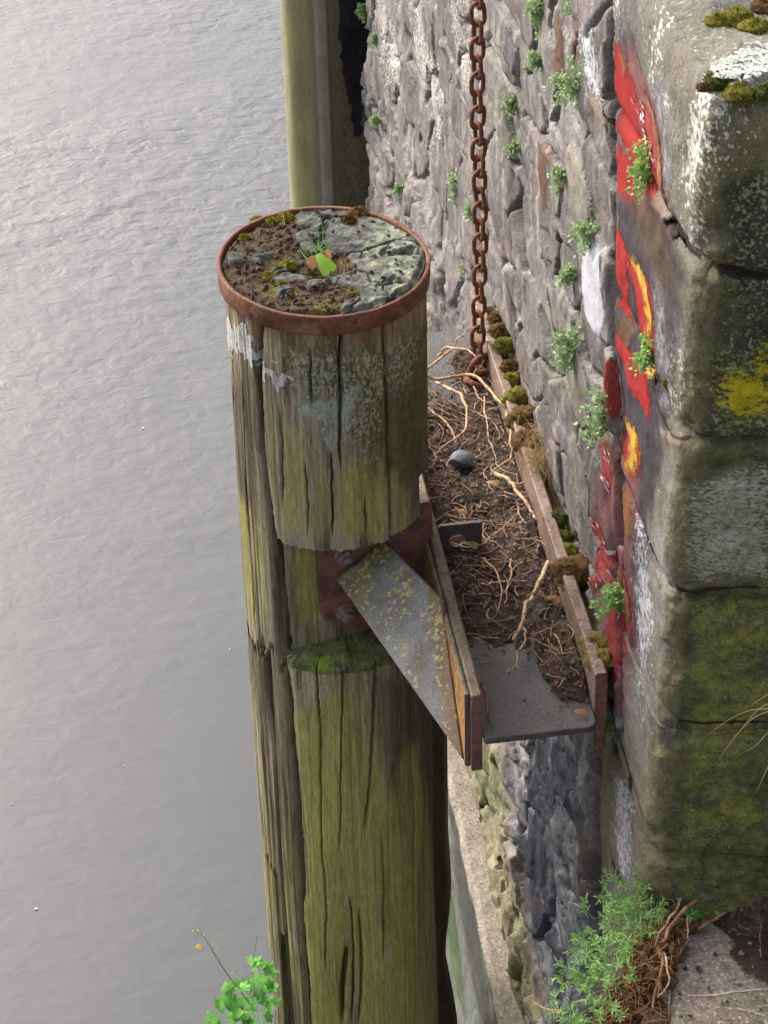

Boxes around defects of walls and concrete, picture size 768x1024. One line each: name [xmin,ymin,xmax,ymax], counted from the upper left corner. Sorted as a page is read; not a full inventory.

crack [676,718,768,726]